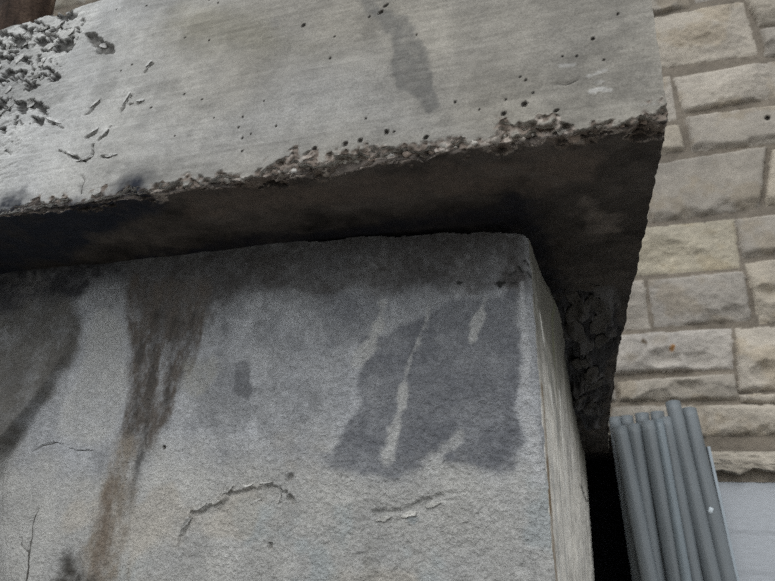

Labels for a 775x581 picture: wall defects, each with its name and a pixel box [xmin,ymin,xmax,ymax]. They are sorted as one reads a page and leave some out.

spalling [0,9,115,152]
leakage [355,0,444,118]
spalling [2,91,668,217]
leakage [563,195,625,237]
leakage [0,144,611,581]
spalling [551,284,624,432]
crack [21,513,37,581]